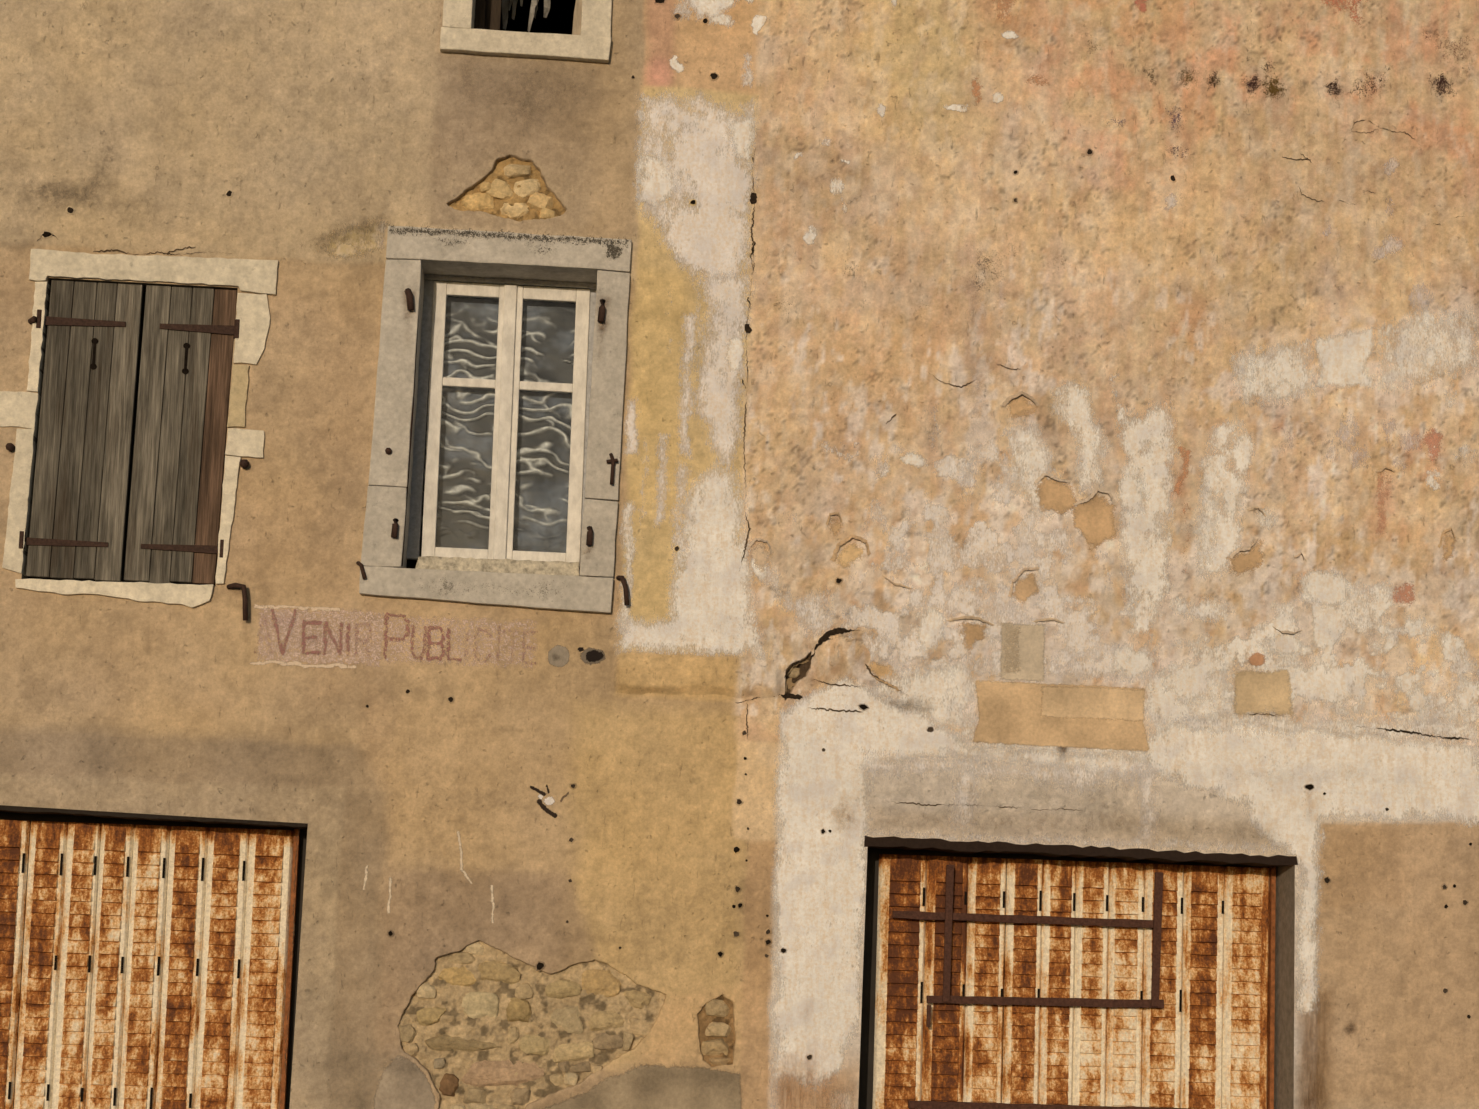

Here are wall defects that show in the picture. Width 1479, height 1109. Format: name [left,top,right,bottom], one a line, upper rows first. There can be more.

flaking render [449,157,566,221]
peeling [616,55,1479,1109]
crack [739,627,907,737]
flaking render [398,941,665,1109]